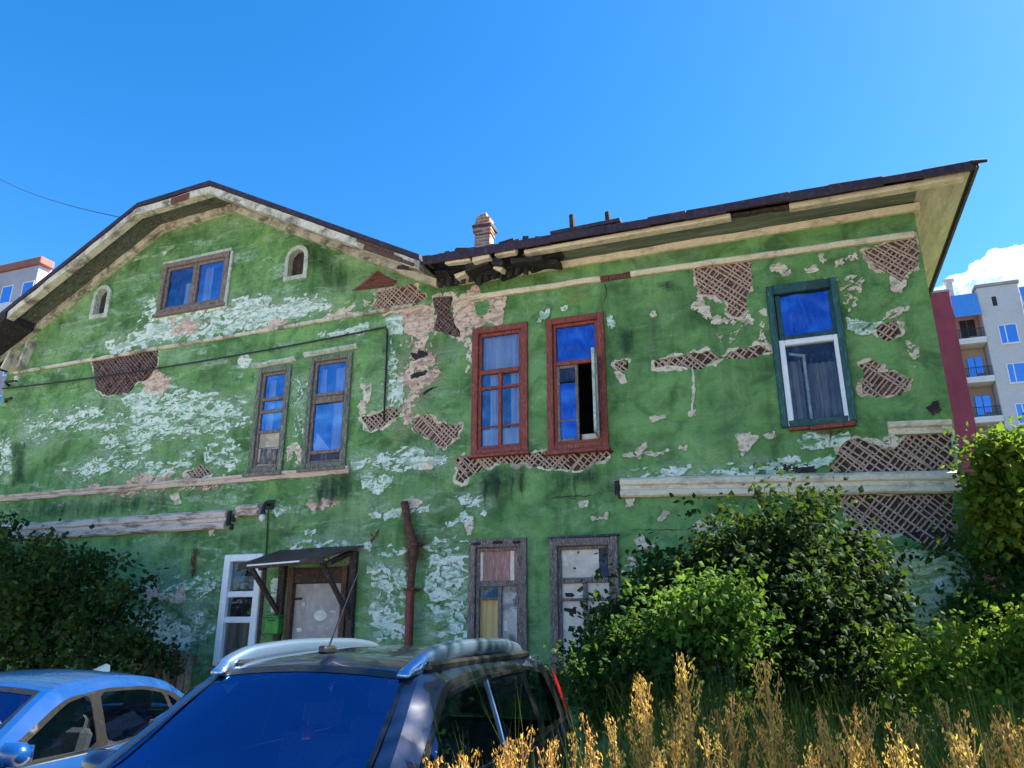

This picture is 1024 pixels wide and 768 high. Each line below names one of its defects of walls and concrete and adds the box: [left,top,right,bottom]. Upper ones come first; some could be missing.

spalling [651,261,773,372]
spalling [804,232,920,398]
peeling [0,283,958,651]